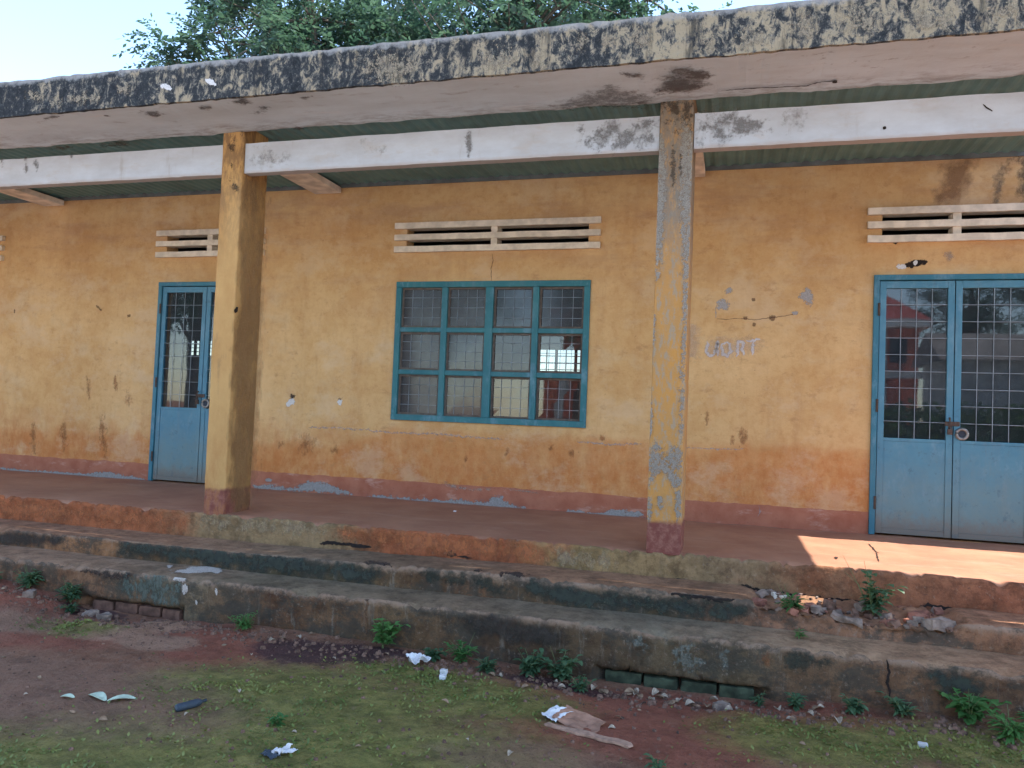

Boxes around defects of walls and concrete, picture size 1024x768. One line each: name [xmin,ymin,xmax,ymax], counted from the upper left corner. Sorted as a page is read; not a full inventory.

water stain [579,69,762,186]
spalling [896,260,928,269]
peeling [566,122,693,522]
crack [723,298,793,327]
peeling [792,287,814,315]
flaking render [253,478,352,495]
flaking render [369,494,526,509]
crack [885,660,910,706]